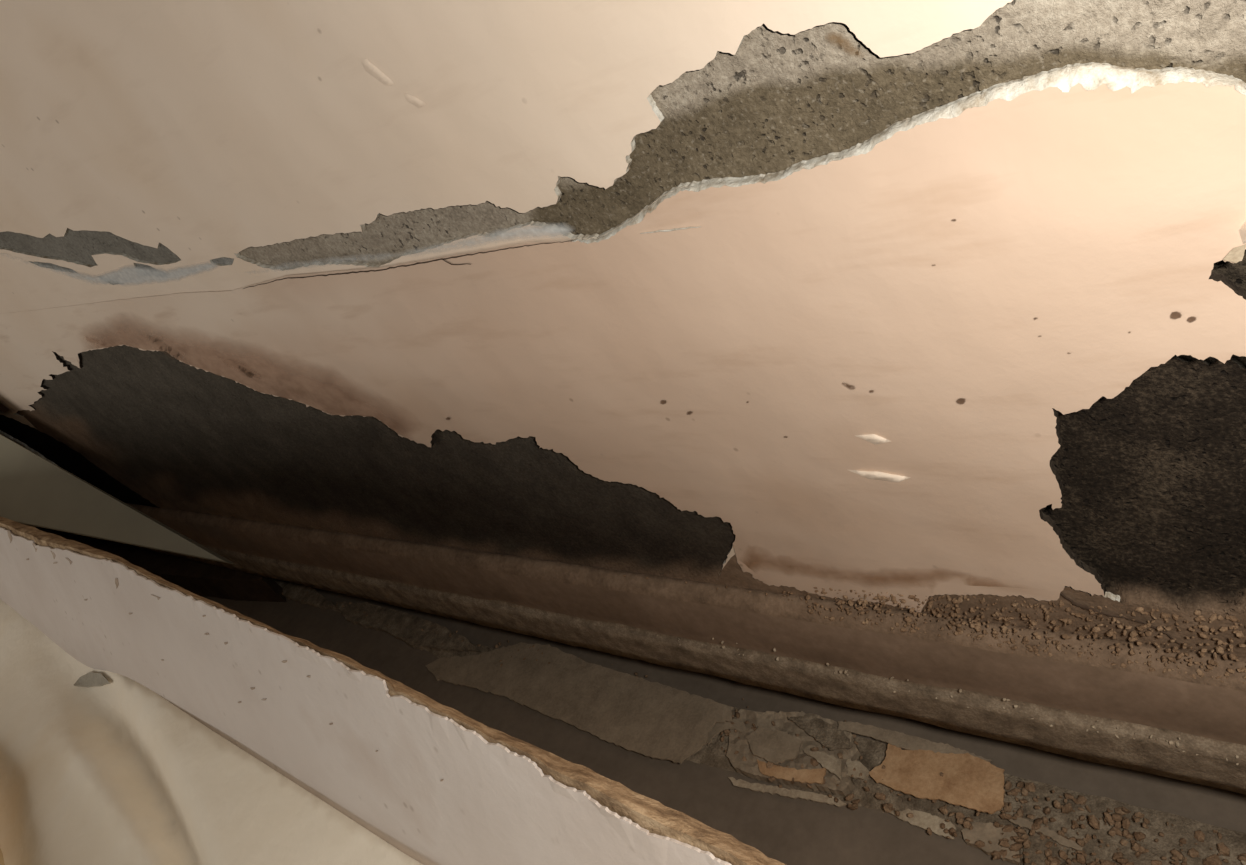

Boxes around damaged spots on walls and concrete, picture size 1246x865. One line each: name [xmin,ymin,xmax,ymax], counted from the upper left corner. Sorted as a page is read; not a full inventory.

peeling [0,229,180,272]
peeling [212,0,1246,268]
leakage [1212,249,1246,292]
peeling [17,345,734,583]
leakage [1042,358,1246,616]
peeling [728,721,1084,851]